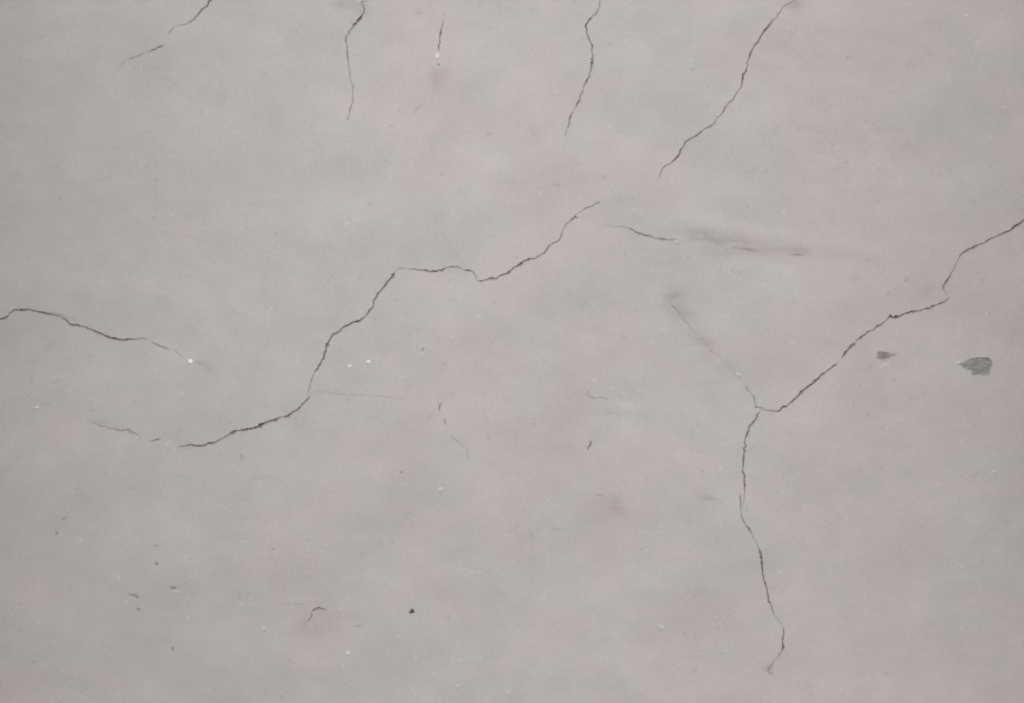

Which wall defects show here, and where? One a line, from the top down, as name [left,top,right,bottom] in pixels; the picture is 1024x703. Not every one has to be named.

crack [569,2,600,123]
crack [661,20,773,171]
crack [315,202,599,371]
crack [186,397,310,447]
crack [740,220,1024,501]
spalling [961,358,992,374]
crack [746,526,785,654]